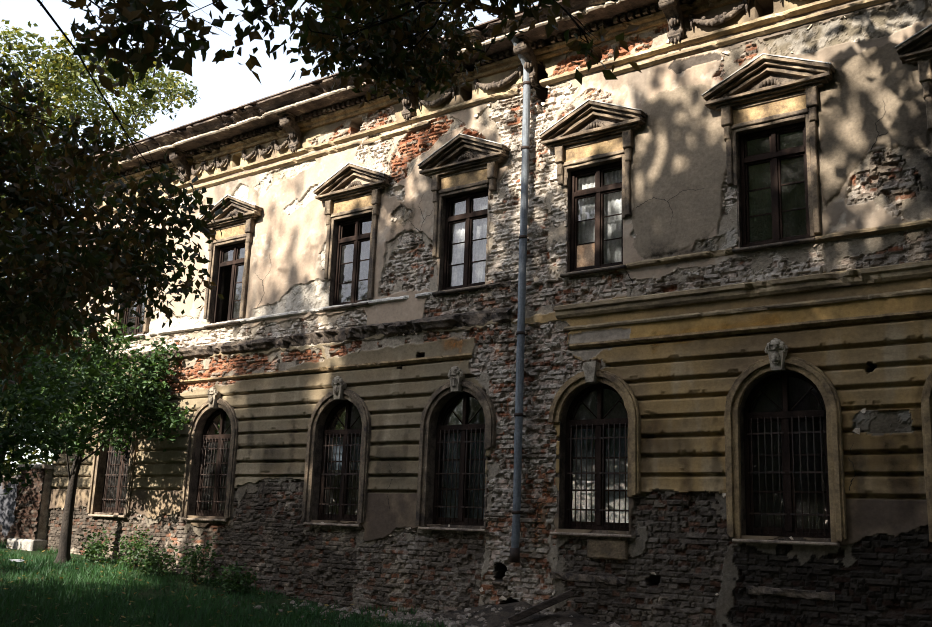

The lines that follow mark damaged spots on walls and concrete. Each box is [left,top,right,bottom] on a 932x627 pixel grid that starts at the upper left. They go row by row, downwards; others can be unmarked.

spalling [308,105,397,150]
spalling [232,159,317,209]
spalling [283,182,320,215]
spalling [355,115,487,225]
spalling [423,82,523,322]
spalling [525,22,932,318]
spalling [378,229,438,297]
spalling [104,242,367,355]
peeling [0,479,19,535]
spalling [46,507,64,552]
spalling [70,319,932,627]